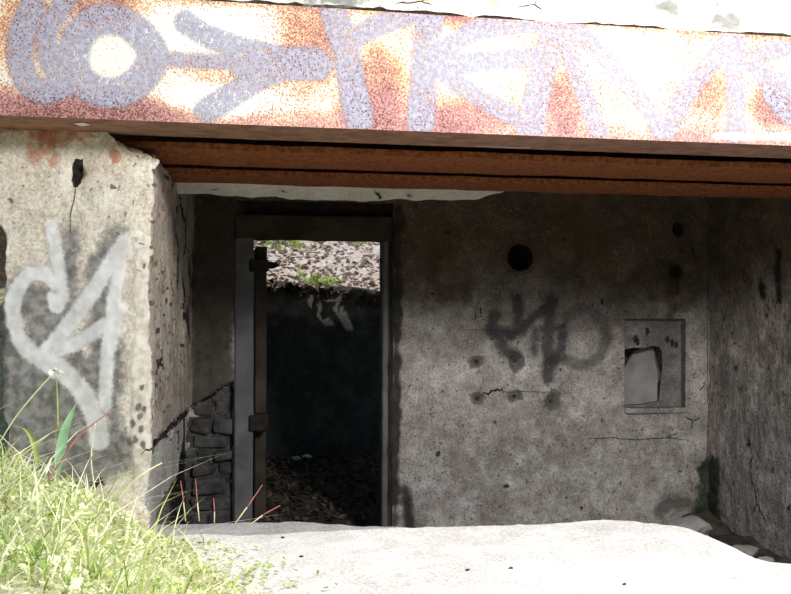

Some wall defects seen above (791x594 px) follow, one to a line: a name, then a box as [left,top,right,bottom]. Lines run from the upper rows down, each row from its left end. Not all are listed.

corrosion [0,128,95,166]
corrosion [109,149,121,163]
crack [141,384,226,455]